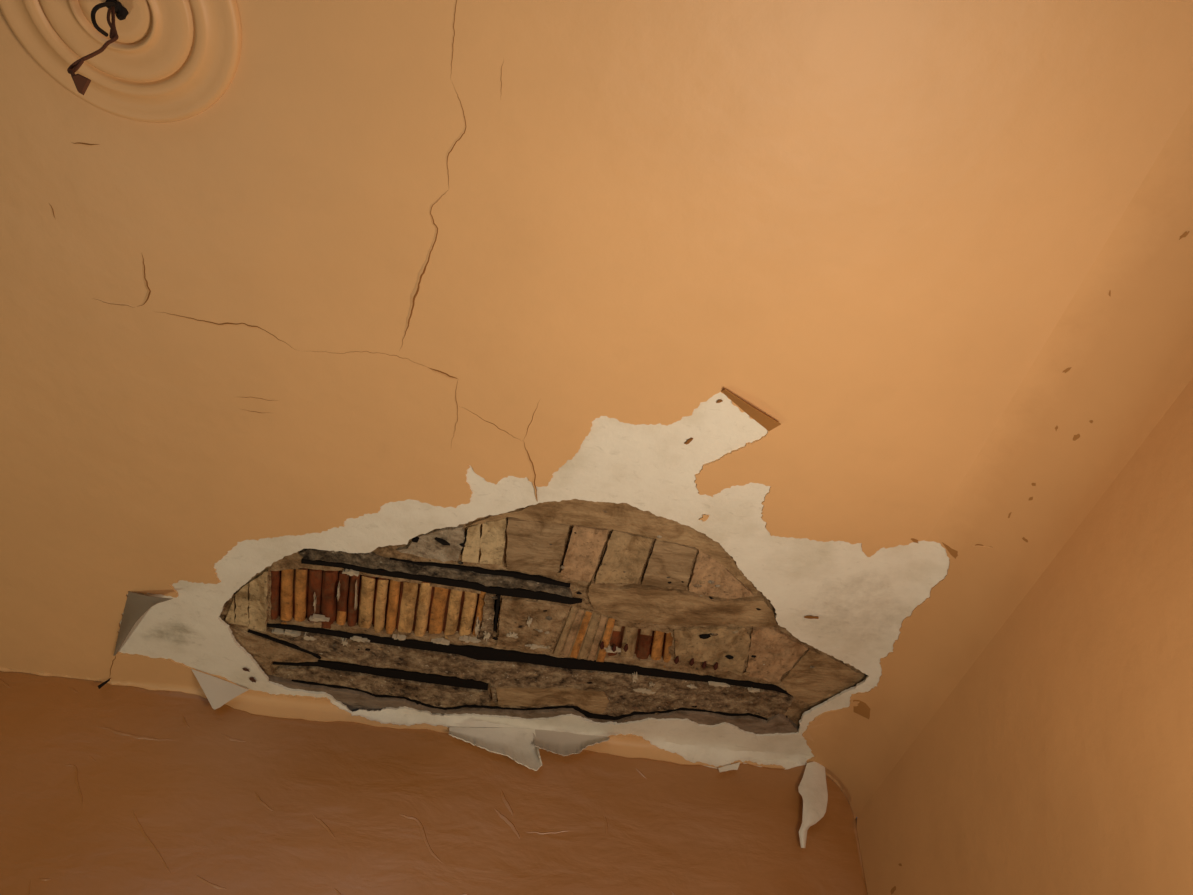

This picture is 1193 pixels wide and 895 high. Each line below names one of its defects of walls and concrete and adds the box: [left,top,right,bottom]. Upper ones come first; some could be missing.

crack [92,0,540,502]
spalling [114,389,958,772]